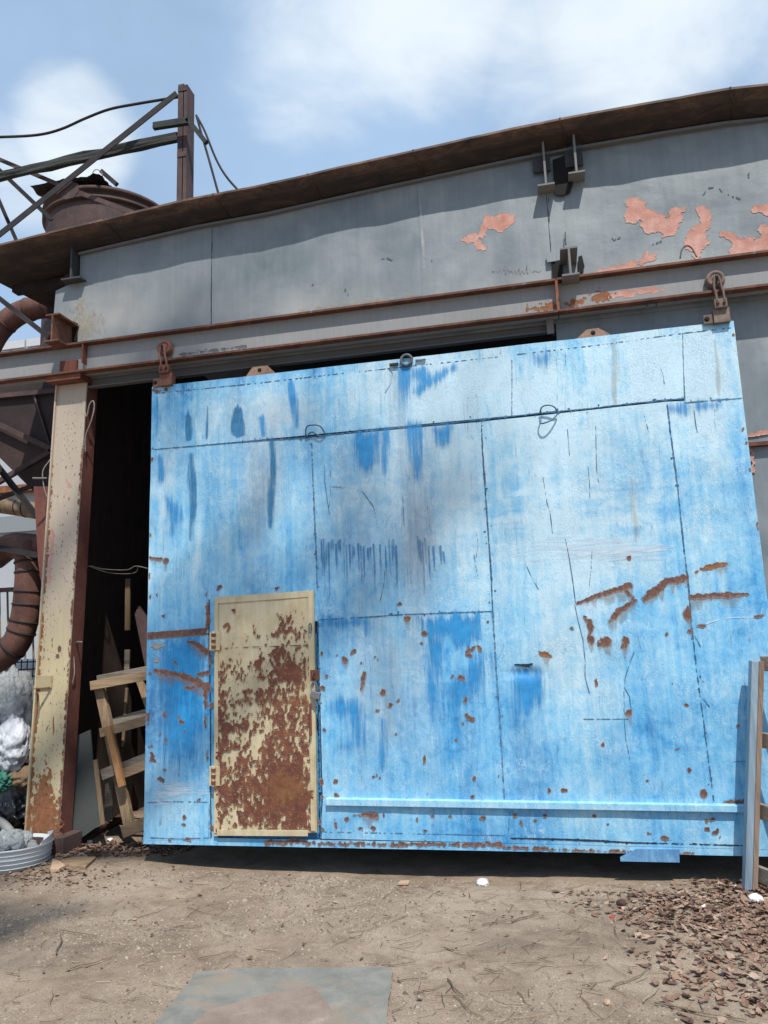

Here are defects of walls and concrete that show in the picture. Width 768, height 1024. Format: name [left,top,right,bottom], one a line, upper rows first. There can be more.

peeling [460,213,515,251]
peeling [593,187,768,273]
peeling [608,286,665,299]
corrosion [574,562,728,649]
corrosion [683,591,749,633]
corrosion [27,448,84,836]
corrosion [186,640,209,656]
corrosion [153,668,211,692]
corrosion [263,838,631,853]